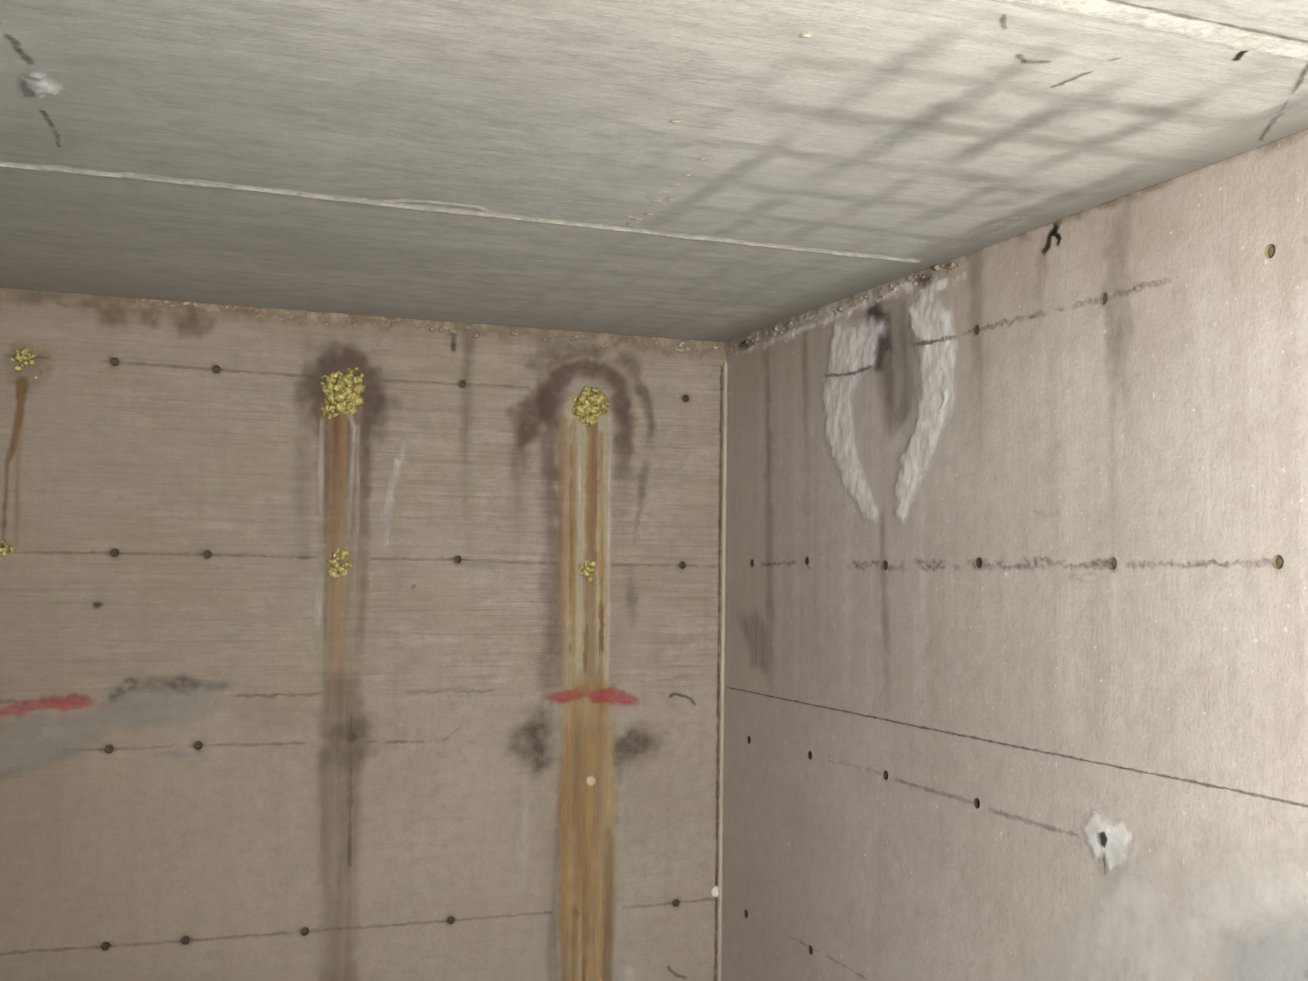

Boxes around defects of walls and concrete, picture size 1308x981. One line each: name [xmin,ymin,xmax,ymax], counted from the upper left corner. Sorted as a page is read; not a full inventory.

corrosion [6,378,27,469]
damp [521,357,649,445]
damp [823,305,891,520]
damp [895,305,955,520]
corrosion [559,417,613,981]